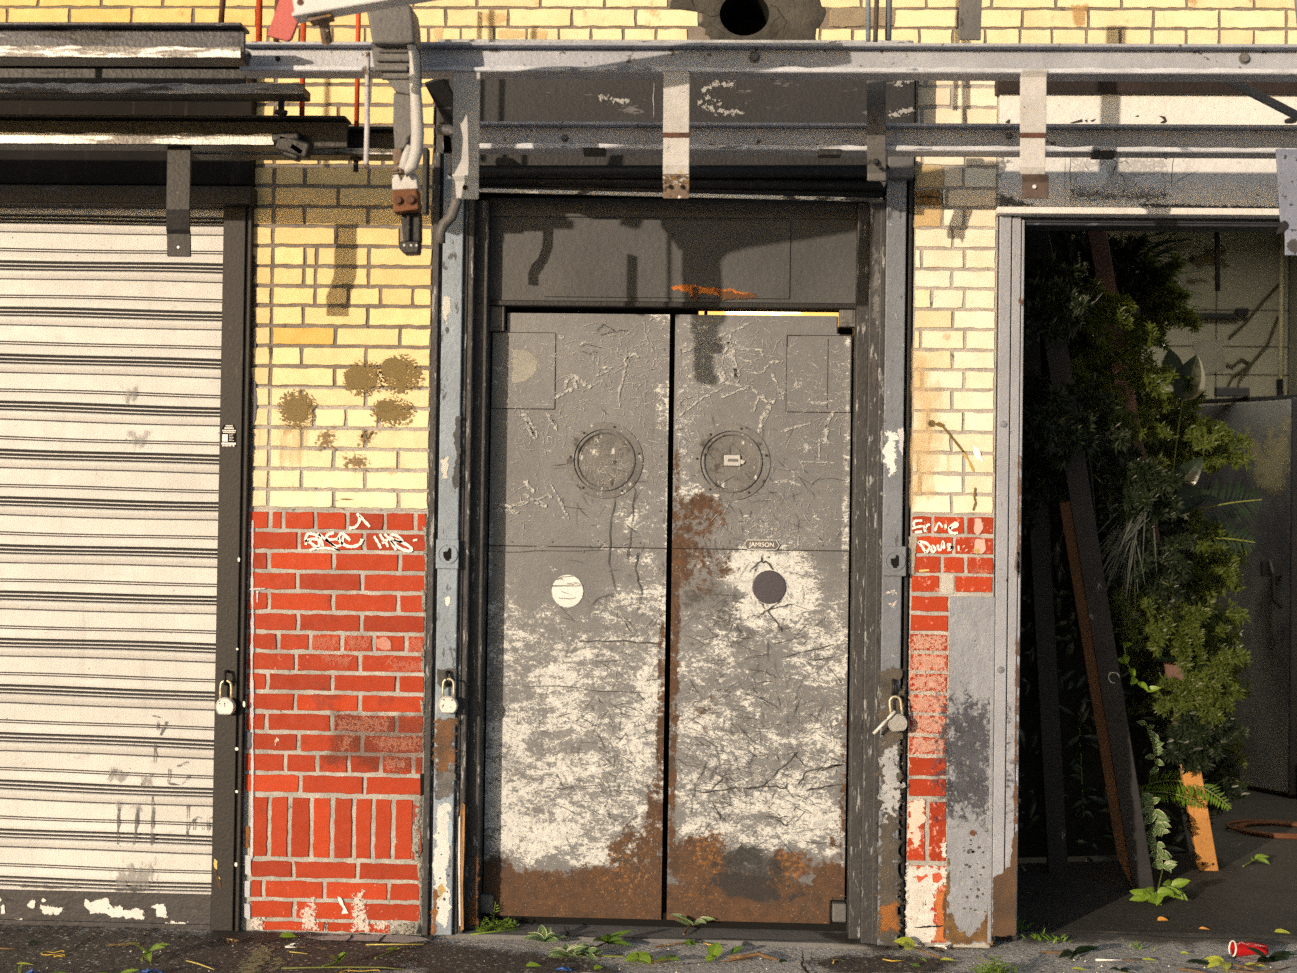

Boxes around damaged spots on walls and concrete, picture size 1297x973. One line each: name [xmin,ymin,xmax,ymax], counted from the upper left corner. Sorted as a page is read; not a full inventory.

rust [671,285,757,301]
damp [313,426,380,473]
peeling [338,764,461,936]
peeling [907,799,927,847]
peeling [905,830,986,944]
rust [934,636,1019,950]